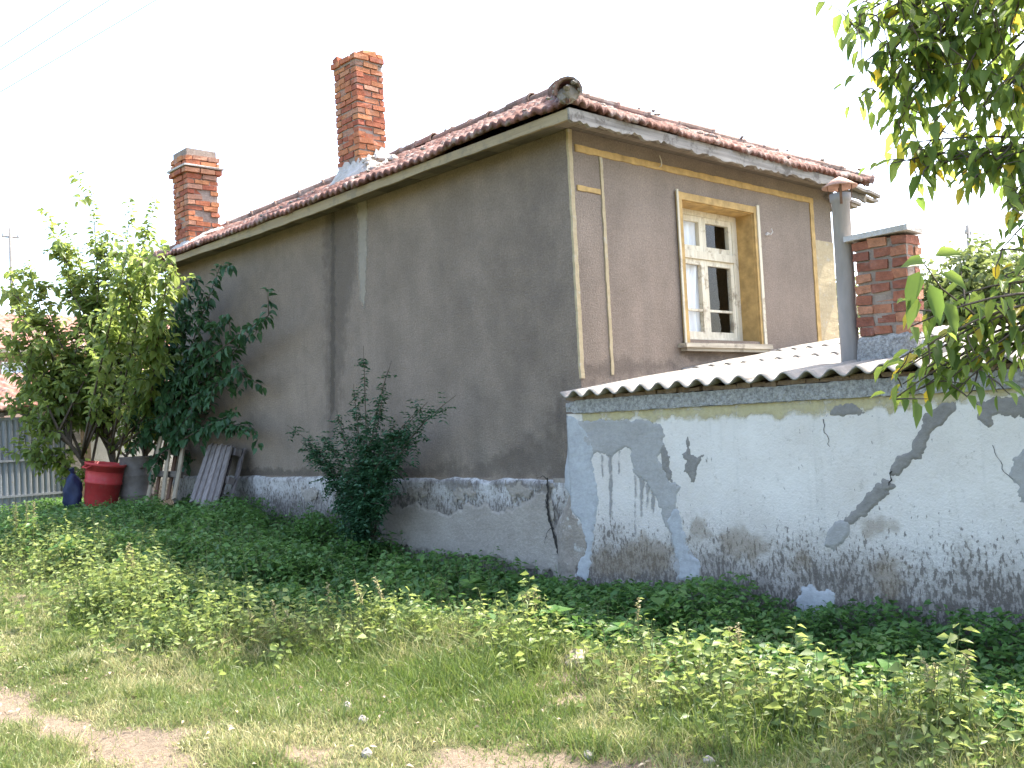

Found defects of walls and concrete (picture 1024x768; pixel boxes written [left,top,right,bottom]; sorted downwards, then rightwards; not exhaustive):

spalling [827,403,869,417]
spalling [976,395,1024,428]
spalling [682,437,704,482]
spalling [1009,449,1024,503]
peeling [376,437,571,580]
crack [538,476,558,554]
peeling [667,508,701,580]
peeling [824,520,850,552]